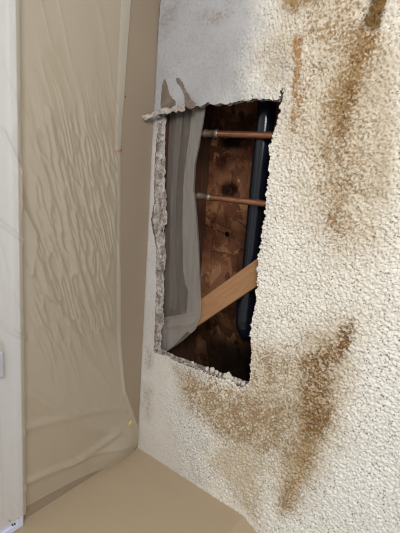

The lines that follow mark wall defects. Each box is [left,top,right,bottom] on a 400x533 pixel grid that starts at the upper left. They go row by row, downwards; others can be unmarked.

spalling [195,89,284,108]
leakage [282,0,389,241]
spalling [152,114,249,387]
leakage [176,323,353,518]